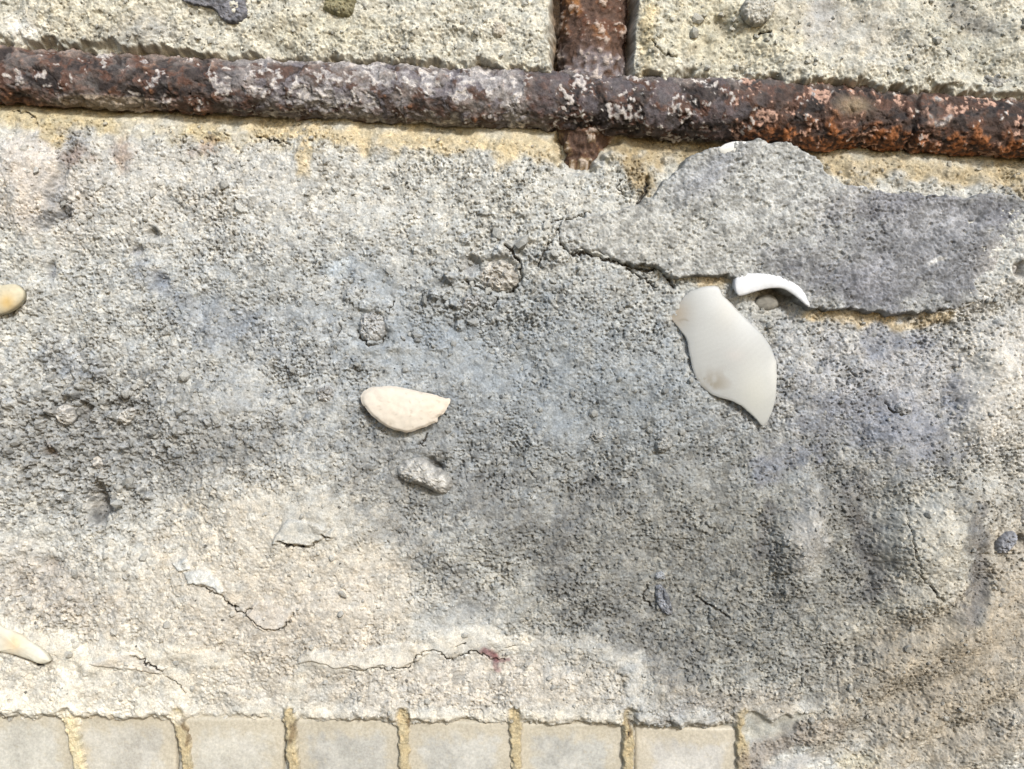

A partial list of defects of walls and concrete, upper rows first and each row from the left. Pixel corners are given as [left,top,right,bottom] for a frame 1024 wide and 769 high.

spalling [323,0,356,17]
hole [706,14,738,47]
corrosion [0,0,1024,200]
crack [466,213,674,307]
crack [202,586,291,630]
crack [357,642,514,671]